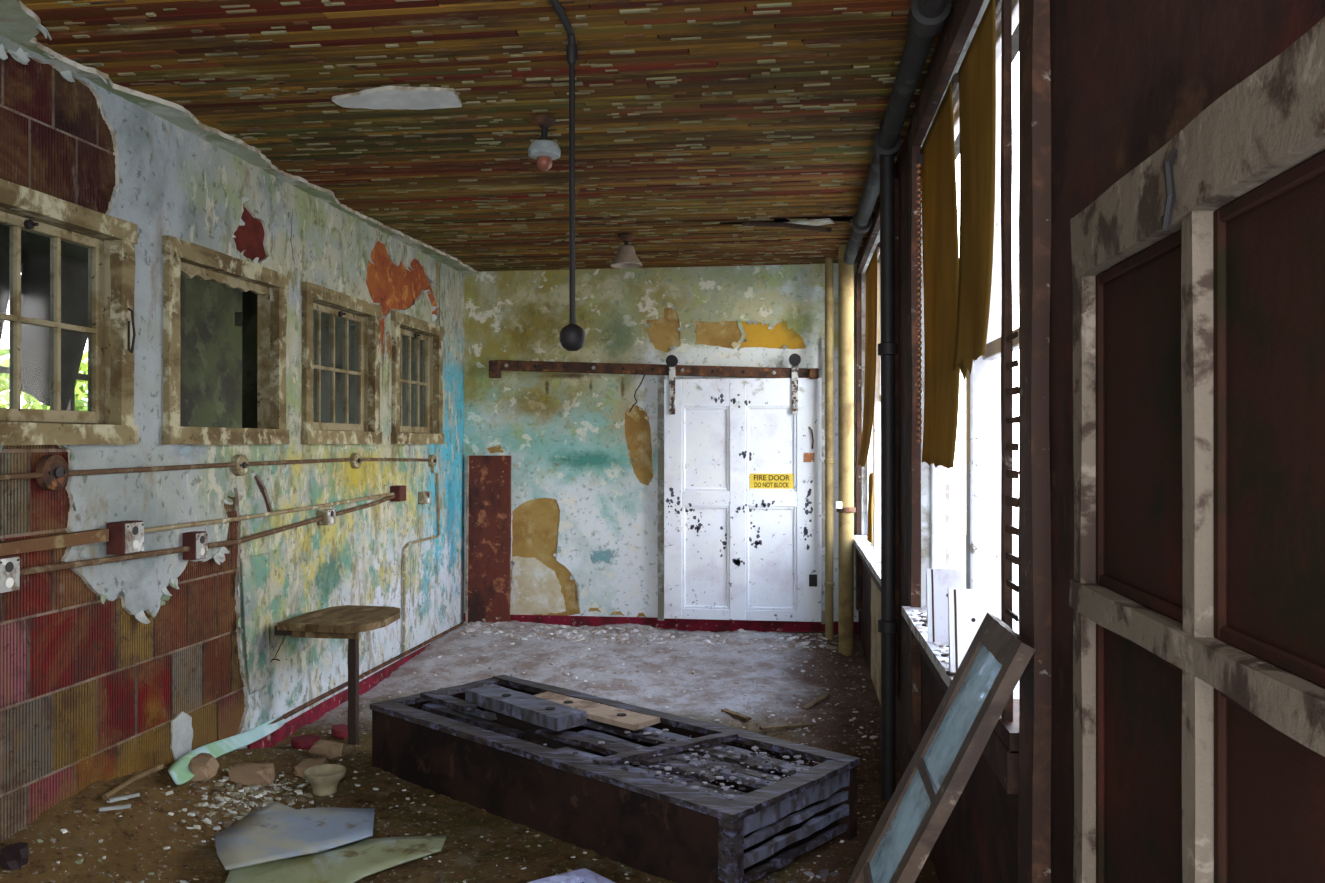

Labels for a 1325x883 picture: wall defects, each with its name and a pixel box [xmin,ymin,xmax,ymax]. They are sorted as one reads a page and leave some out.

flaking render [0,44,119,214]
flaking render [232,198,268,266]
flaking render [366,241,439,361]
peeling [646,305,806,353]
peeling [510,498,646,618]
peeling [666,488,775,566]
peeling [801,480,813,550]
flaking render [0,445,246,843]